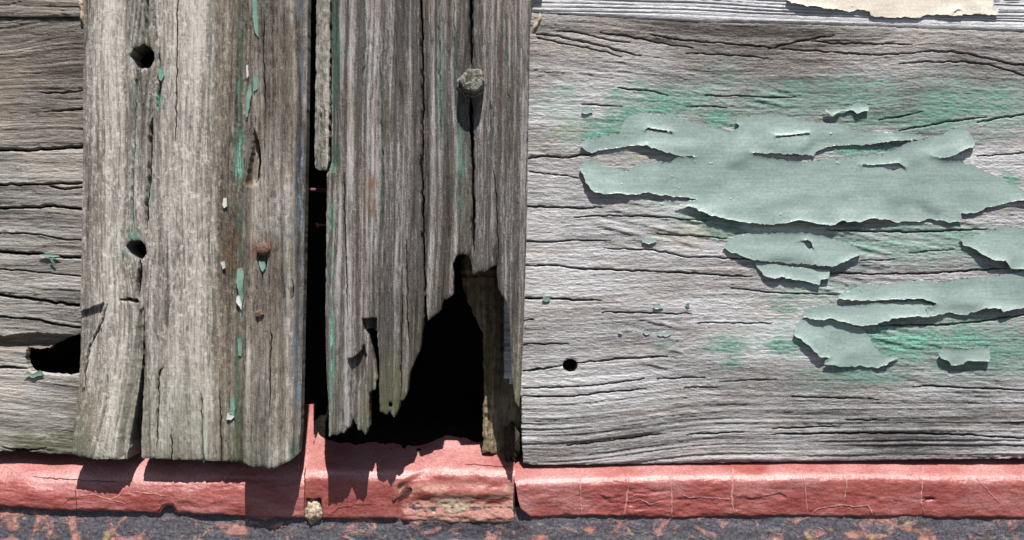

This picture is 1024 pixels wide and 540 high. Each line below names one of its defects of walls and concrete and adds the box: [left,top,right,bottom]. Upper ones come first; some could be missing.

peeling [787,0,999,18]
crack [536,31,1024,76]
crack [131,0,179,236]
crack [581,88,793,108]
crack [882,112,1024,131]
peeling [580,102,1024,285]
peeling [793,225,1024,368]
crack [568,469,873,516]
crack [895,467,934,511]